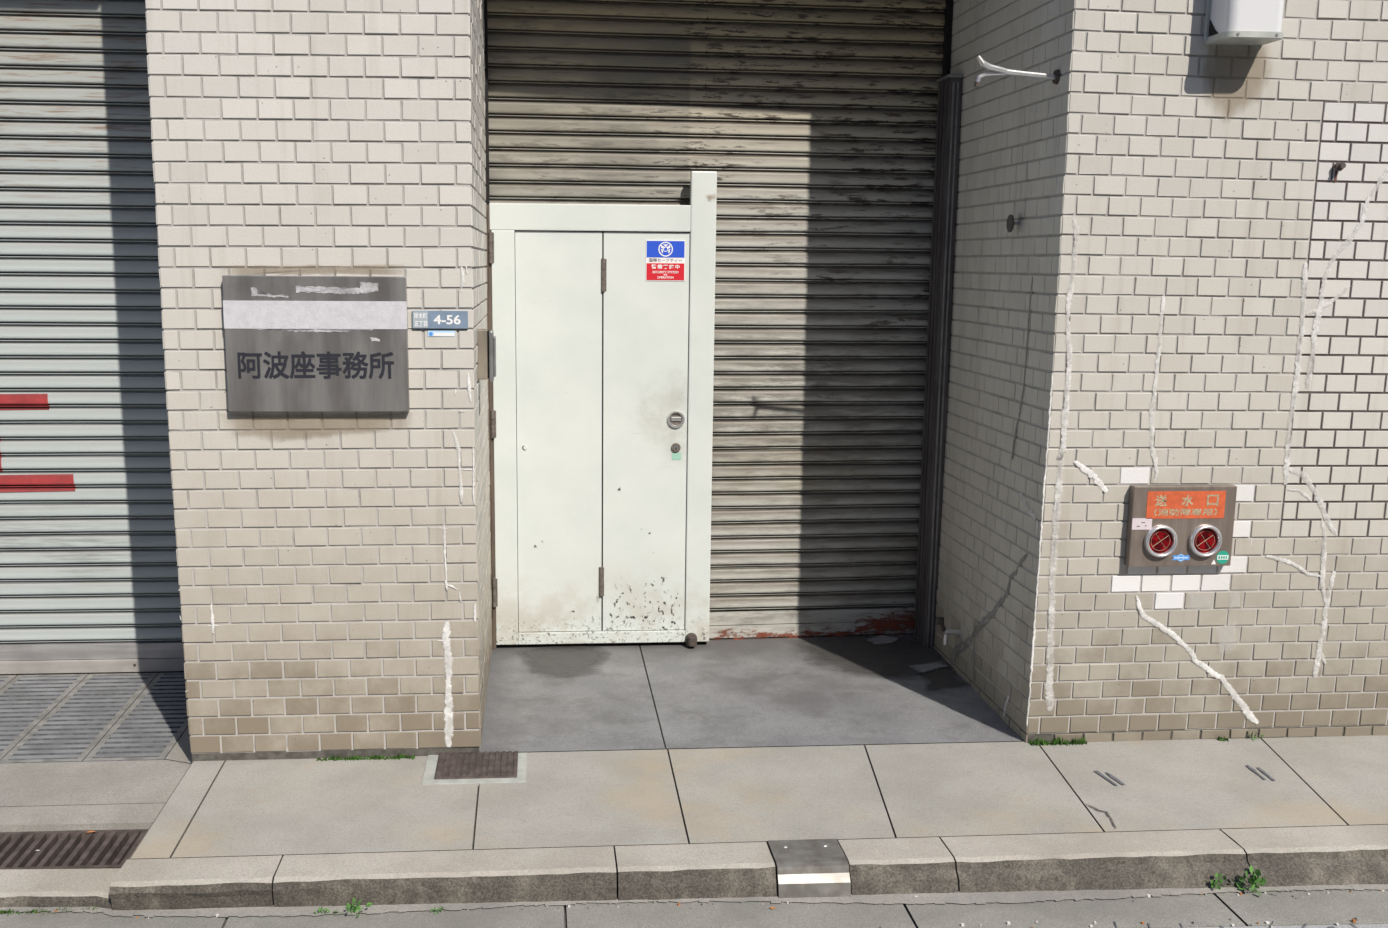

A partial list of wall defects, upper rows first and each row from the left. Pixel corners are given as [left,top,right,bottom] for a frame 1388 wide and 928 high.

crack [438,372,476,747]
crack [951,218,1108,726]
crack [1149,296,1165,482]
crack [1136,596,1259,724]
crack [1266,167,1388,679]